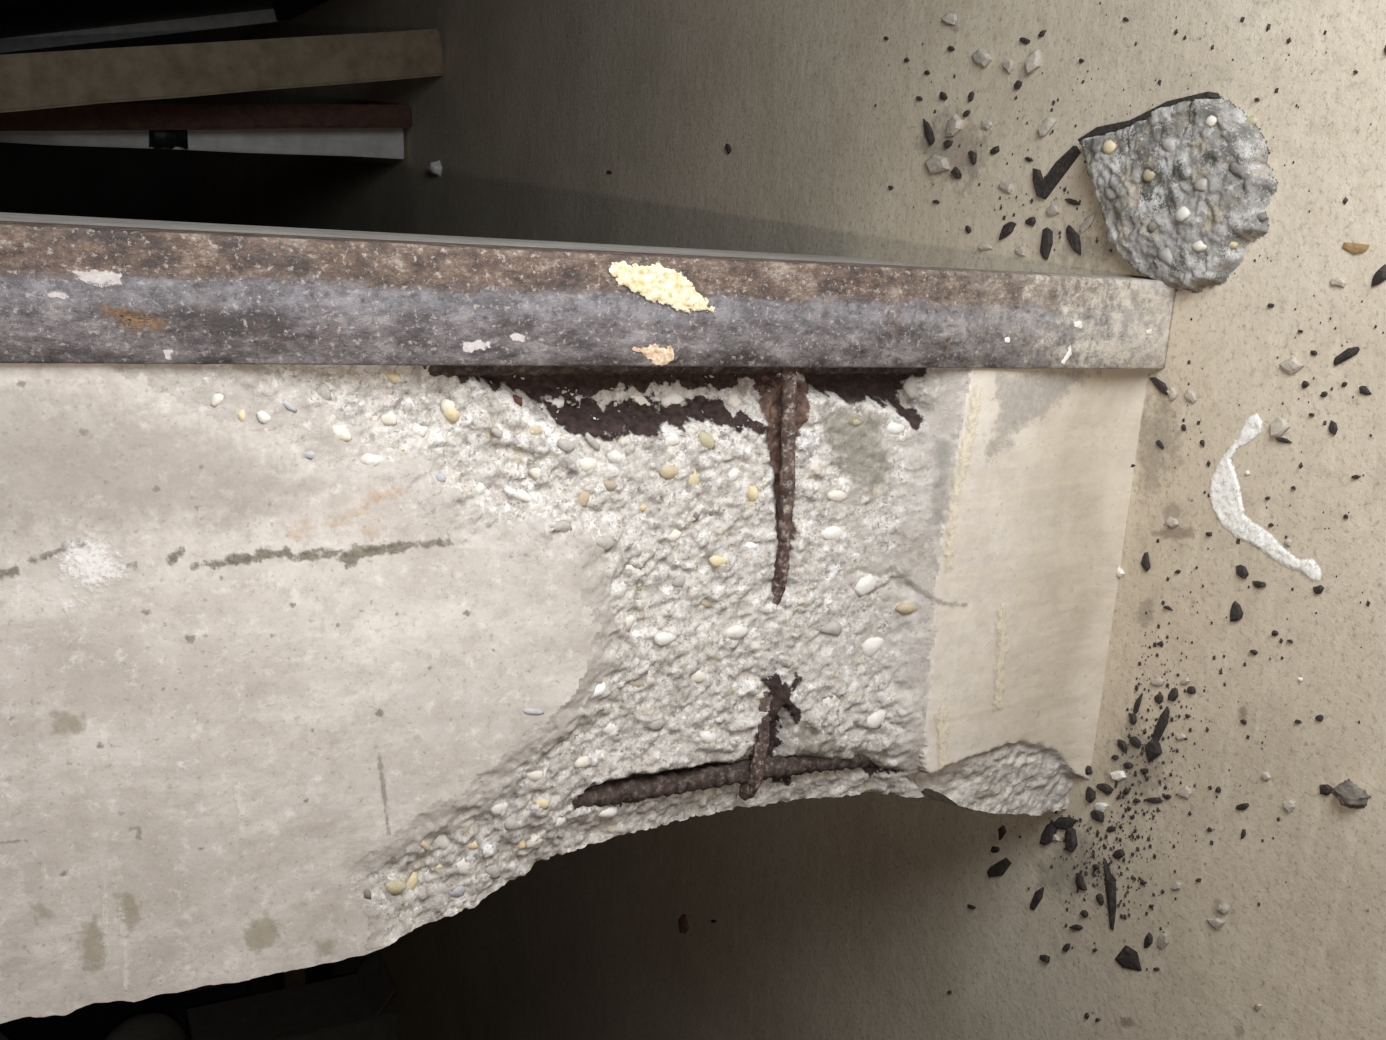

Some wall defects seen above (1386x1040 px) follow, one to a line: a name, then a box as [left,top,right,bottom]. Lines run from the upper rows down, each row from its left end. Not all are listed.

rust [458,368,927,592]
crack [0,542,84,578]
crack [168,538,450,569]
spalling [106,363,1087,955]
rust [574,672,806,810]
rust [862,763,904,778]